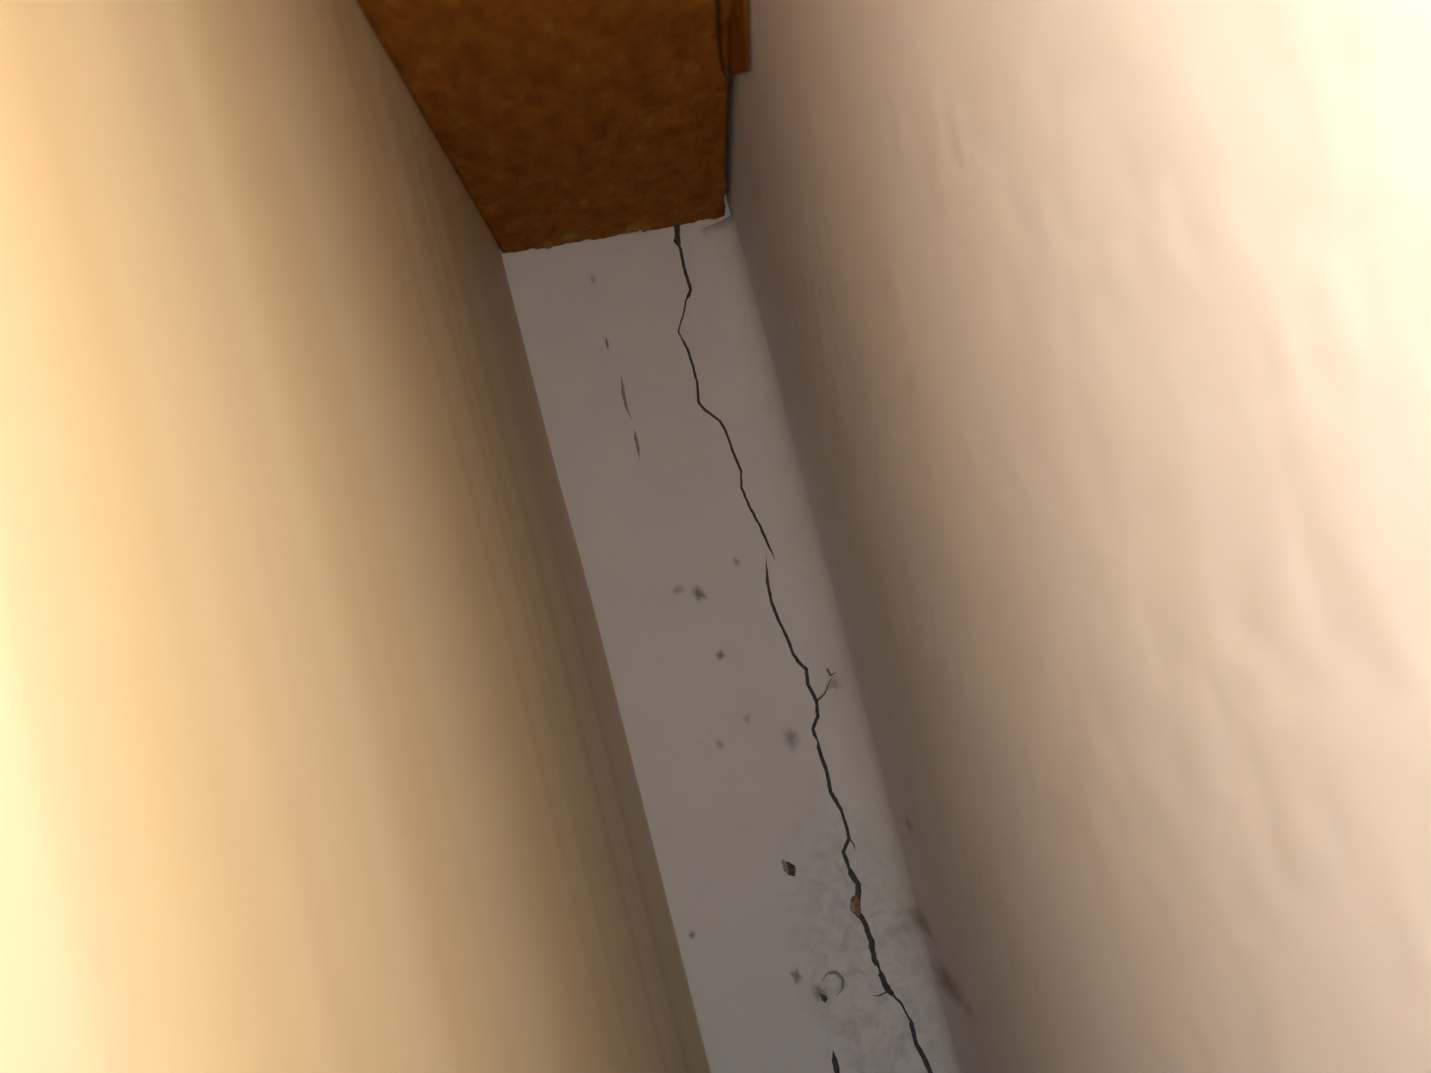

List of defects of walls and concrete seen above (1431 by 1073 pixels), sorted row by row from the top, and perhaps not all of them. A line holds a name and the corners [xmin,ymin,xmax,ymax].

crack [674,225,933,1073]